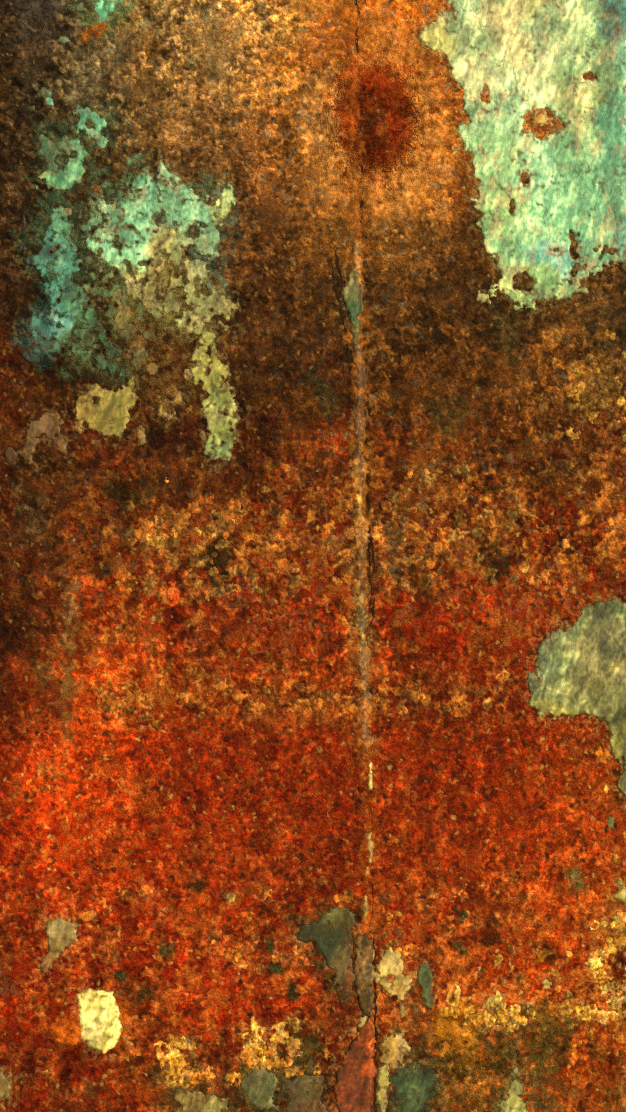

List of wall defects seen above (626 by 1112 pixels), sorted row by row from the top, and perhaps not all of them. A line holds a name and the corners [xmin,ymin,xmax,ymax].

corrosion [311,26,440,212]
peeling [418,0,626,310]
peeling [4,106,240,465]
corrosion [543,329,626,442]
corrosion [124,492,302,598]
corrosion [370,466,577,595]
peeling [527,598,626,797]
peeling [77,988,123,1054]
corrosion [210,935,314,972]
peeling [372,947,434,1018]
peeling [376,1032,441,1112]
corrosion [434,886,529,986]